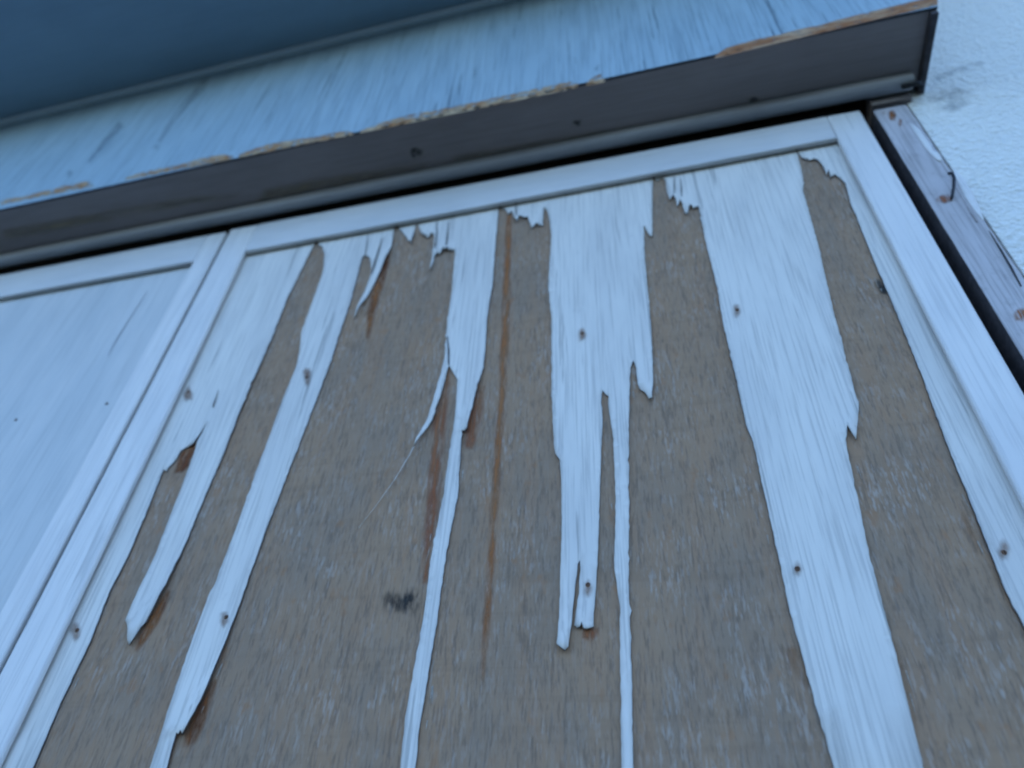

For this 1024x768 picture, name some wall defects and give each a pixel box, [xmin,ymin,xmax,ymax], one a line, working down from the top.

peeling [0,182,93,205]
peeling [35,241,324,768]
corrosion [489,215,511,574]
peeling [169,177,833,768]
peeling [796,150,1024,768]
peeling [909,123,984,223]